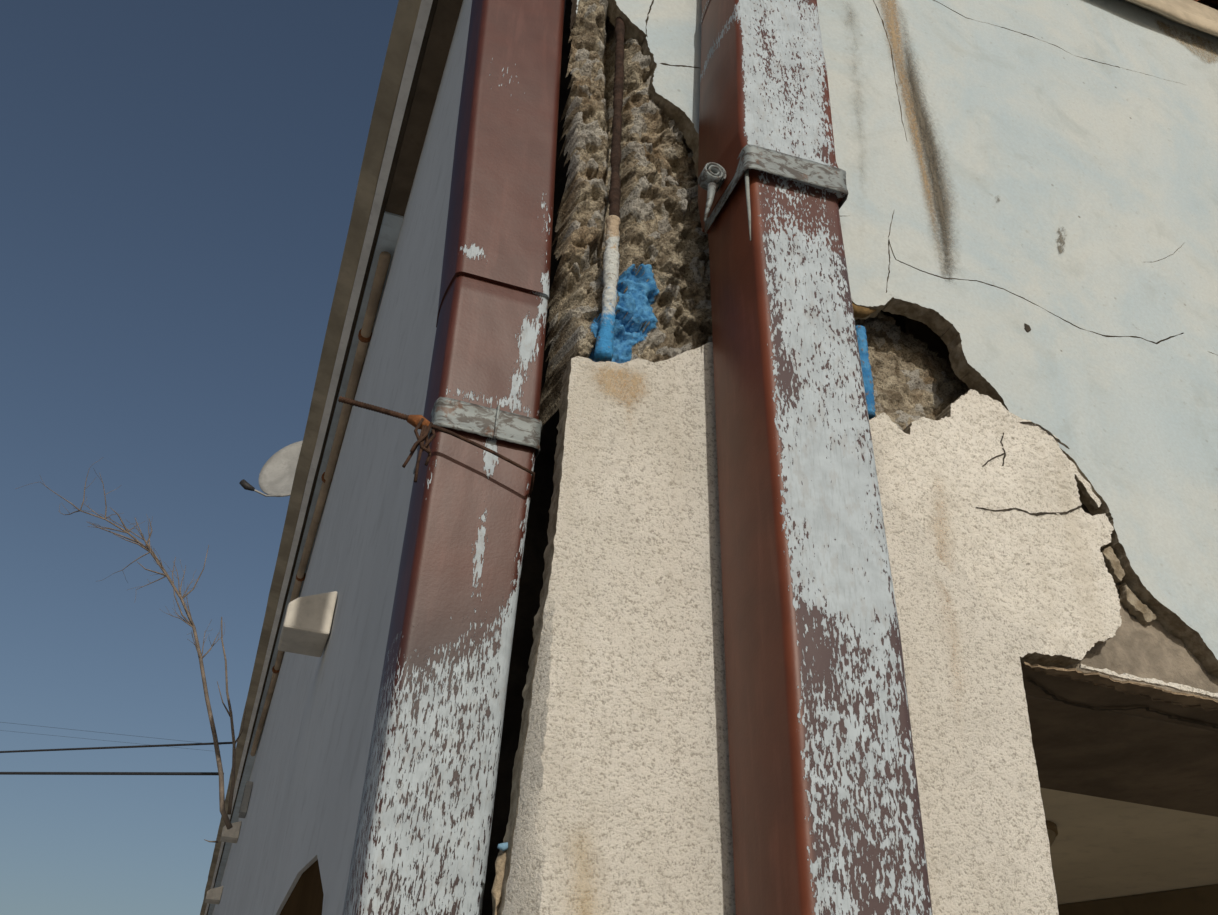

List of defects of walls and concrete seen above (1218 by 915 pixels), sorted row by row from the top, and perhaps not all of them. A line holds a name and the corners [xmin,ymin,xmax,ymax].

spalling [539,0,713,426]
flaking render [852,303,970,431]
crack [982,422,1069,467]
crack [976,506,1081,516]
flaking render [1066,456,1102,515]
flaking render [1024,546,1218,711]